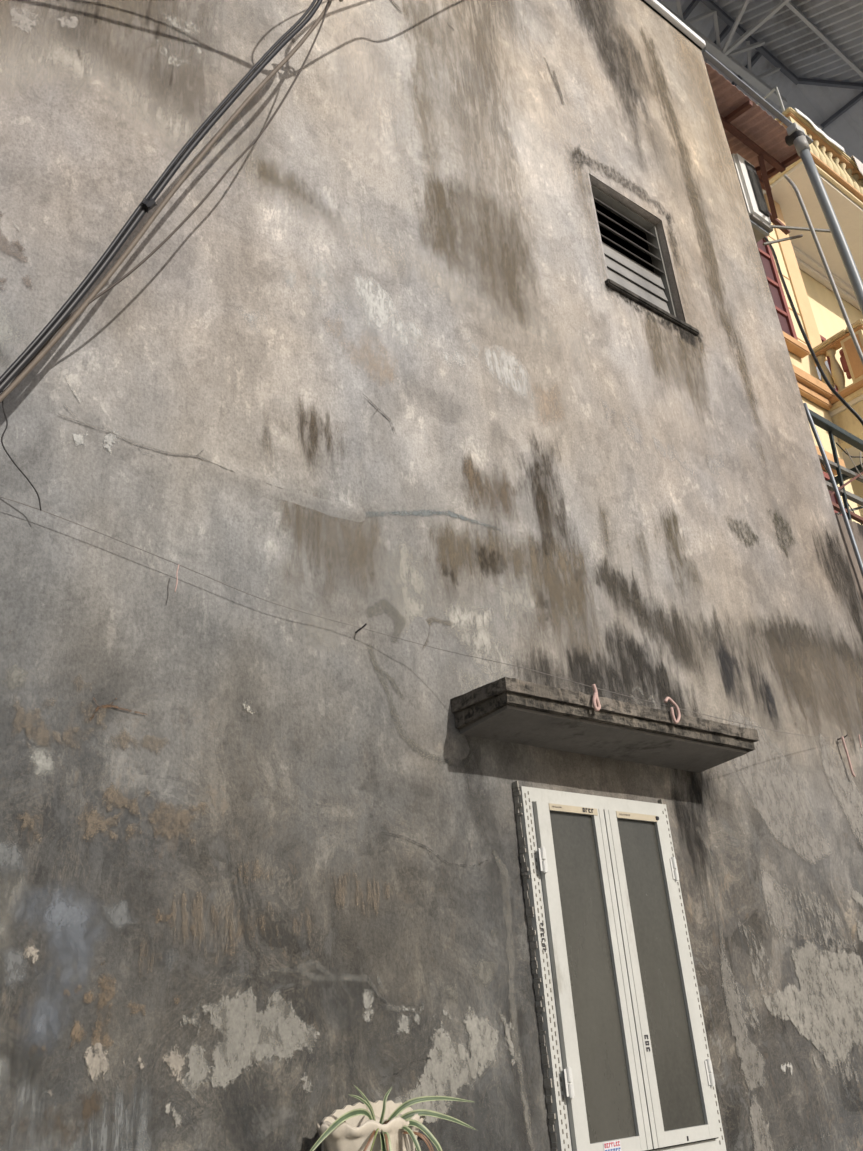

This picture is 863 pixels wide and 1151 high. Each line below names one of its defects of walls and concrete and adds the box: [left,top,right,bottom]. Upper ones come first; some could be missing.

water stain [573,148,677,260]
water stain [621,29,722,299]
crack [59,376,235,473]
water stain [341,442,584,626]
water stain [396,547,512,674]
water stain [569,629,680,711]
water stain [597,563,776,710]
peeling [64,976,121,1080]
peeling [163,988,320,1098]
peeling [362,989,375,1022]
peeling [393,1007,516,1123]
peeling [719,888,863,1151]